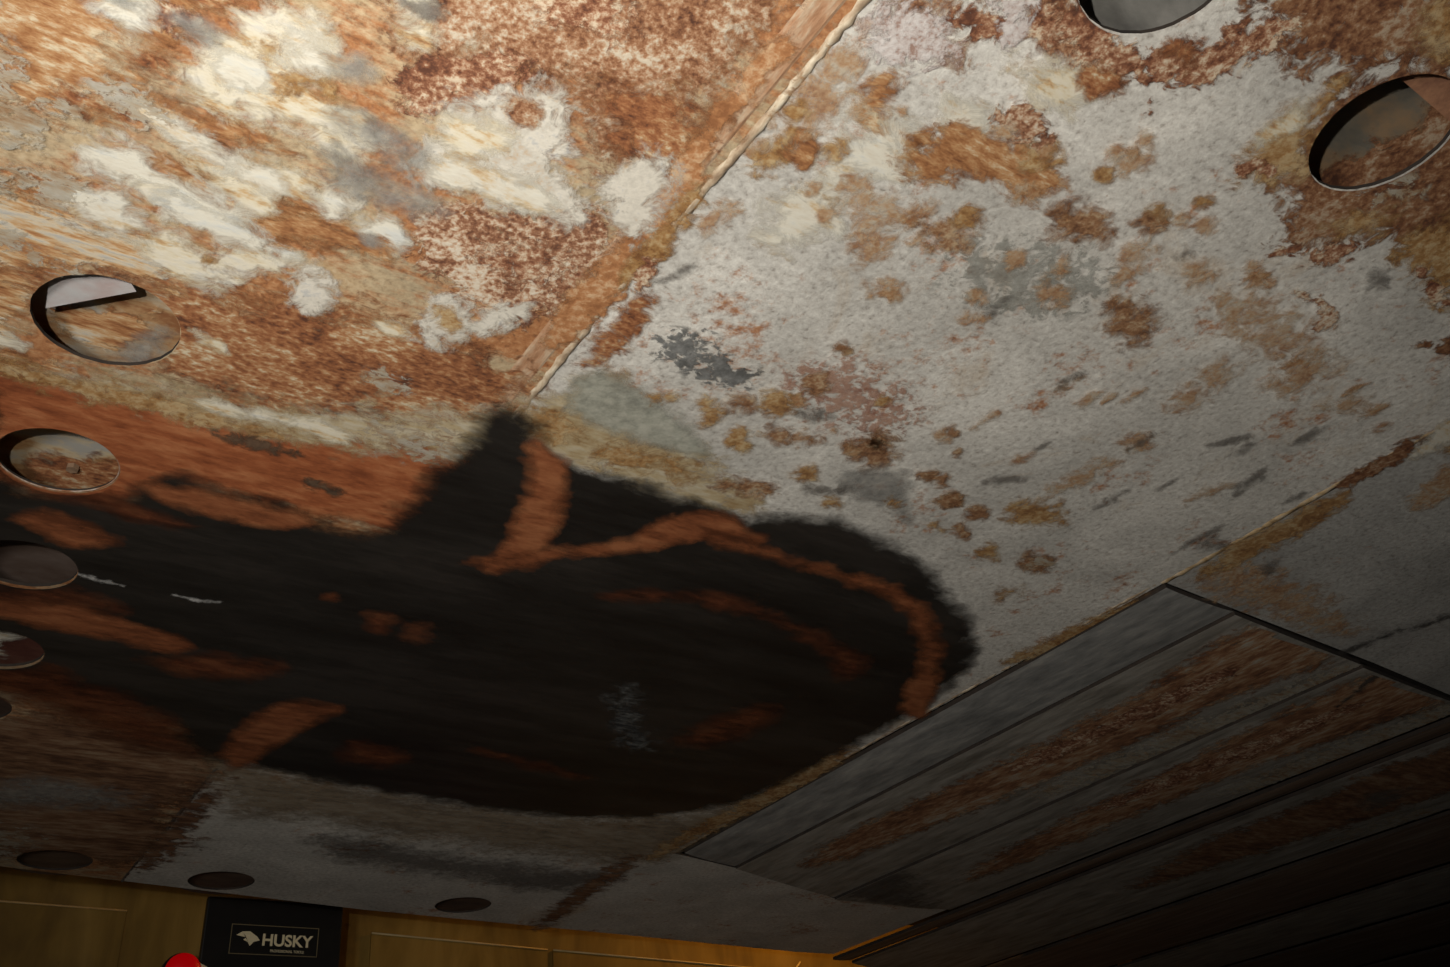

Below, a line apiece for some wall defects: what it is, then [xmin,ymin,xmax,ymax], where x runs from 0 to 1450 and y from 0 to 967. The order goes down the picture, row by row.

rust [0,0,301,156]
rust [142,0,1214,368]
rust [889,0,1450,398]
rust [0,176,543,530]
water stain [58,333,502,465]
rust [697,341,921,471]
water stain [75,483,310,529]
water stain [471,371,944,718]
rust [915,424,1153,562]
water stain [0,588,279,677]
crack [1337,615,1450,707]
water stain [195,702,774,890]